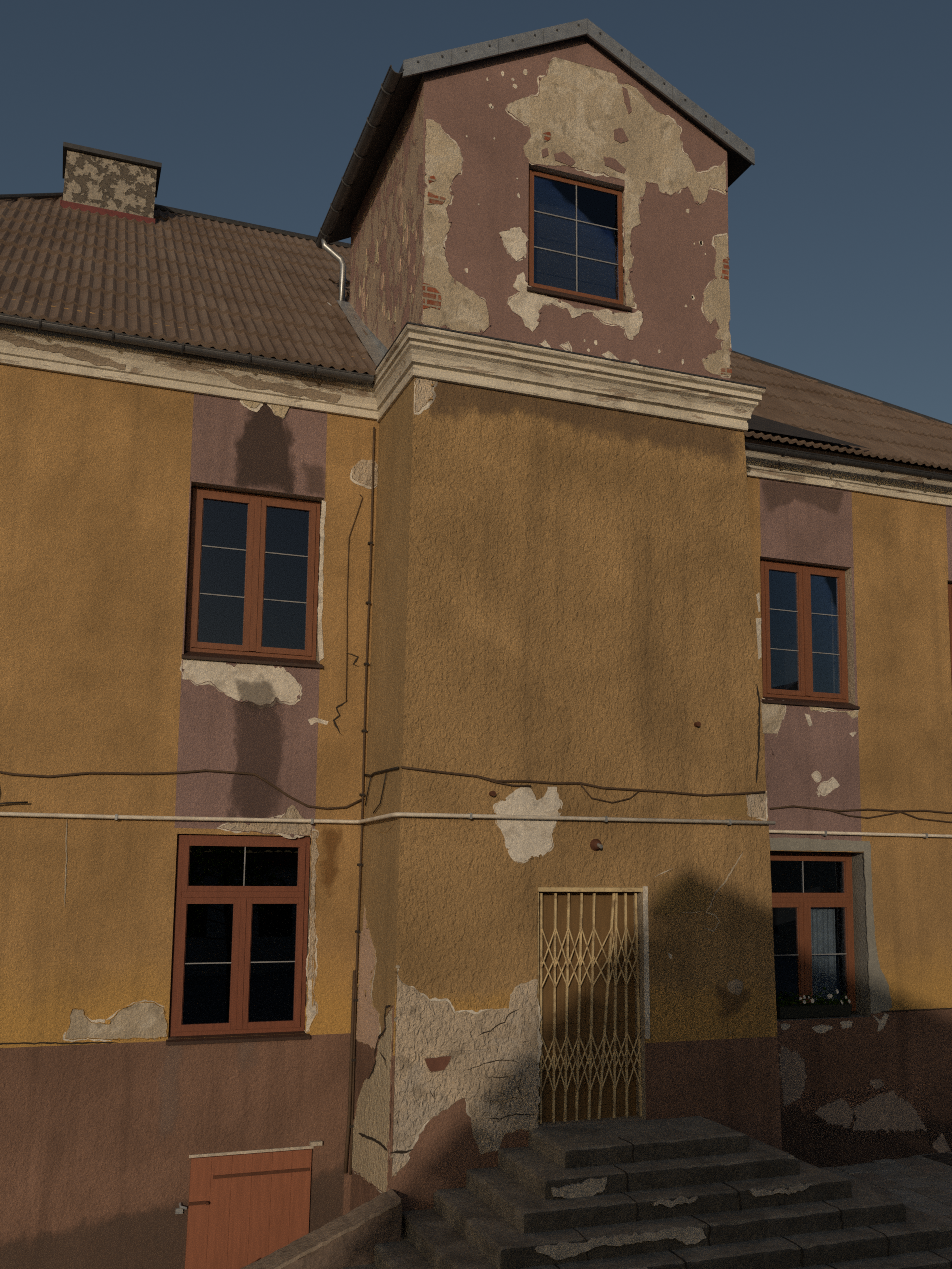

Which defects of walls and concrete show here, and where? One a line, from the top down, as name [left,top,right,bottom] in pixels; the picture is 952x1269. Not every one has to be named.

spalling [359,119,491,335]
peeling [486,57,728,364]
spalling [684,233,732,378]
damp [236,403,293,493]
peeling [180,659,302,706]
damp [233,698,281,818]
peeling [493,786,563,863]
peeling [63,1000,168,1042]
crack [368,1005,390,1079]
flaking render [352,905,543,1193]
crack [464,1010,530,1120]
crack [358,1133,413,1154]